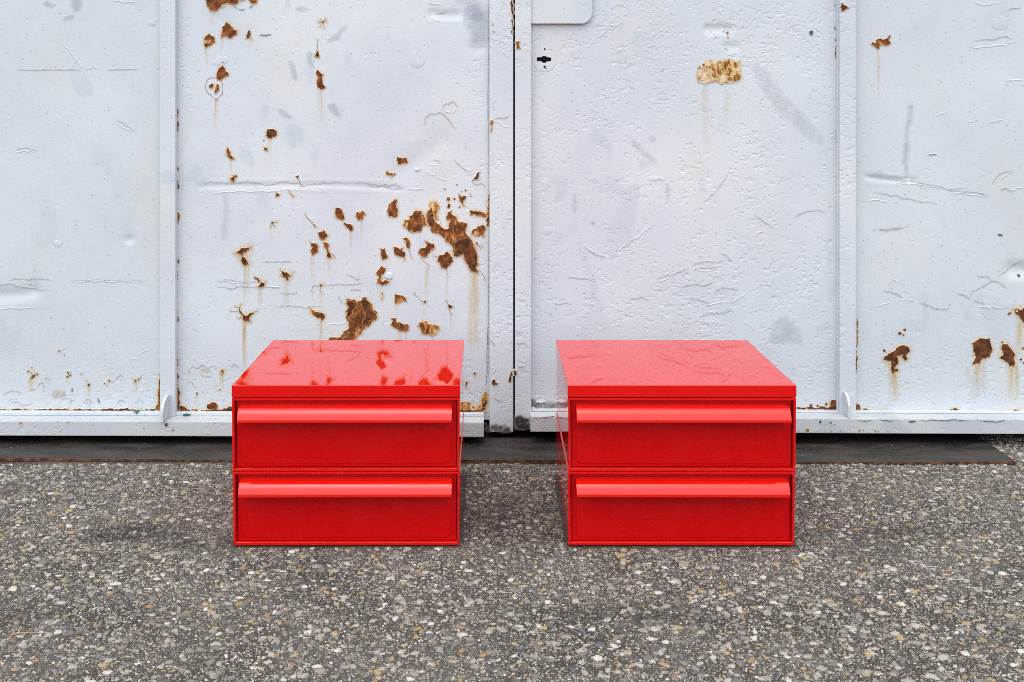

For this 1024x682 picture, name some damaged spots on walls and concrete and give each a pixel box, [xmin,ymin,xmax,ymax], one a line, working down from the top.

rust [205,0,258,12]
rust [205,62,230,105]
rust [203,21,252,49]
rust [314,40,326,90]
rust [697,31,743,85]
rust [870,34,891,50]
rust [263,128,278,151]
rust [306,215,335,259]
rust [328,171,487,340]
rust [310,308,326,325]
rust [883,329,911,385]
rust [971,307,1024,376]